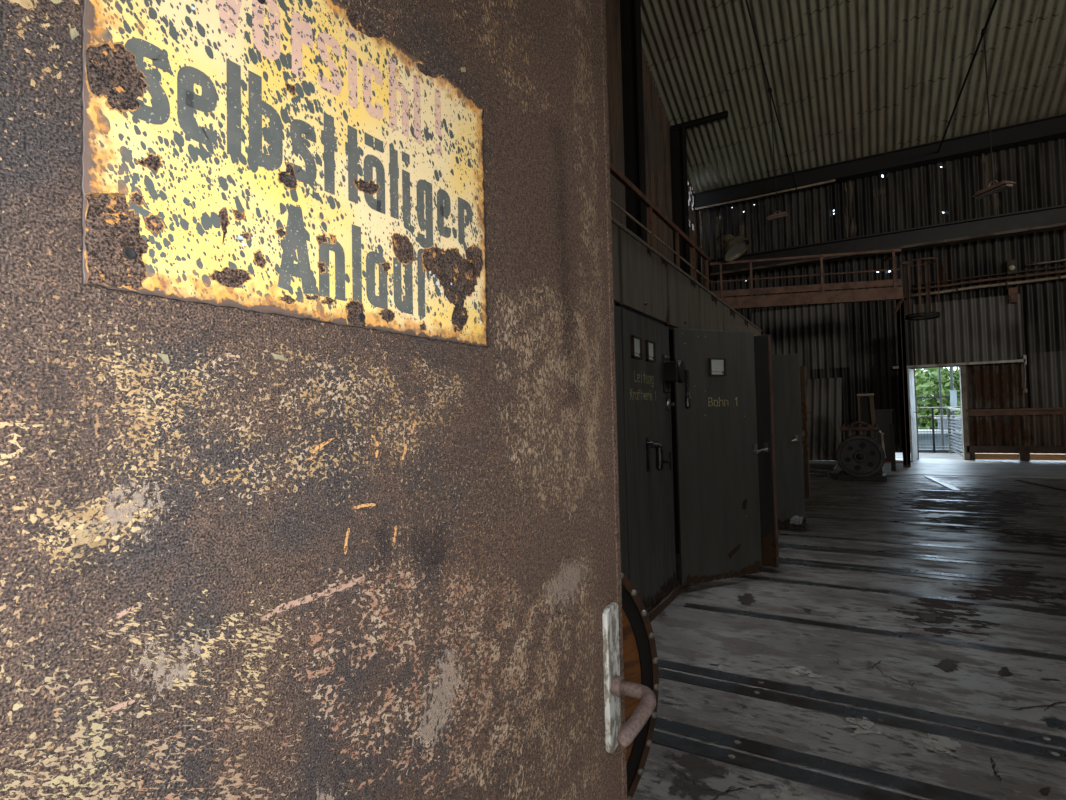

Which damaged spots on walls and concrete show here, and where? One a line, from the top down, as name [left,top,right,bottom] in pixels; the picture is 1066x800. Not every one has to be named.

peeling [4,0,80,74]
peeling [29,43,73,87]
peeling [489,0,609,532]
peeling [0,327,469,583]
damp [890,486,1066,551]
damp [887,562,1066,641]
peeling [0,547,605,800]
crack [1010,702,1066,711]